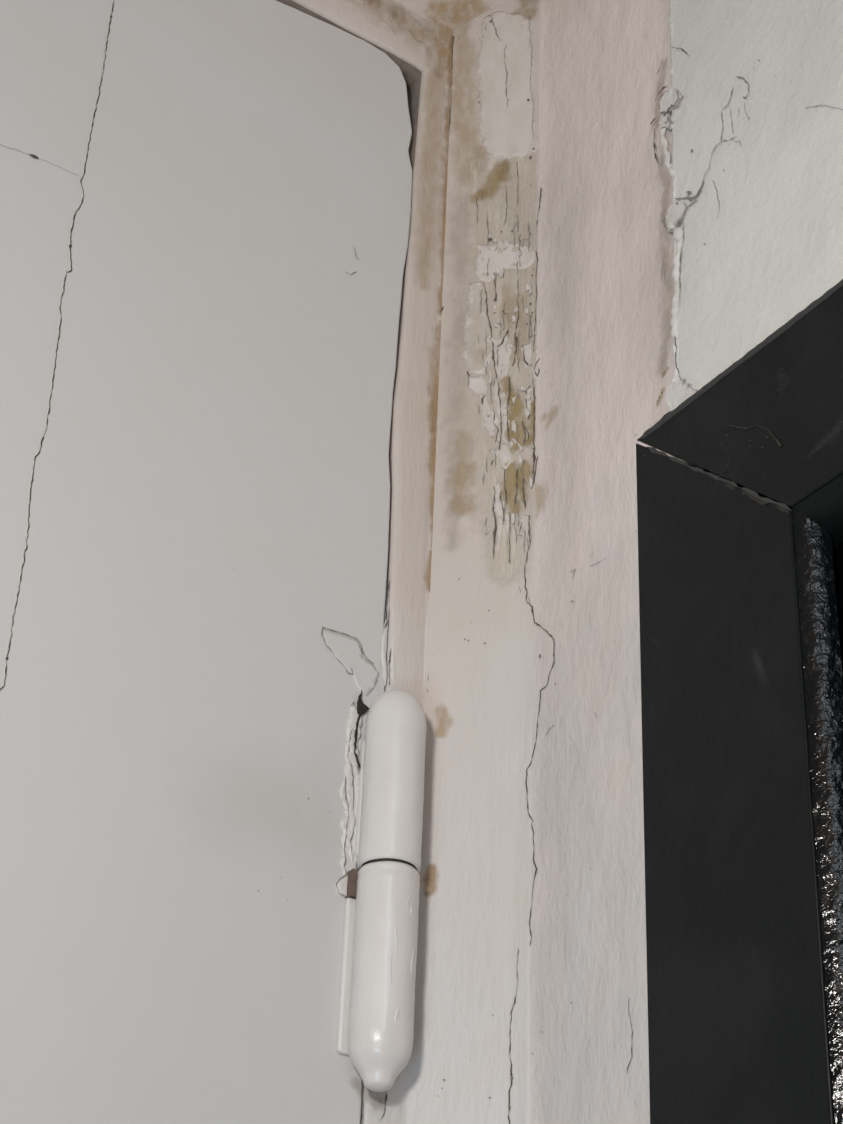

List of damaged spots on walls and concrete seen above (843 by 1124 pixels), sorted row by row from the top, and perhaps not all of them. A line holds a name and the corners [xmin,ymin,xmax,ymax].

crack [0,0,114,690]
peeling [461,11,542,581]
leakage [504,379,535,512]
crack [668,59,776,224]
peeling [321,626,379,897]
crack [489,531,556,1124]